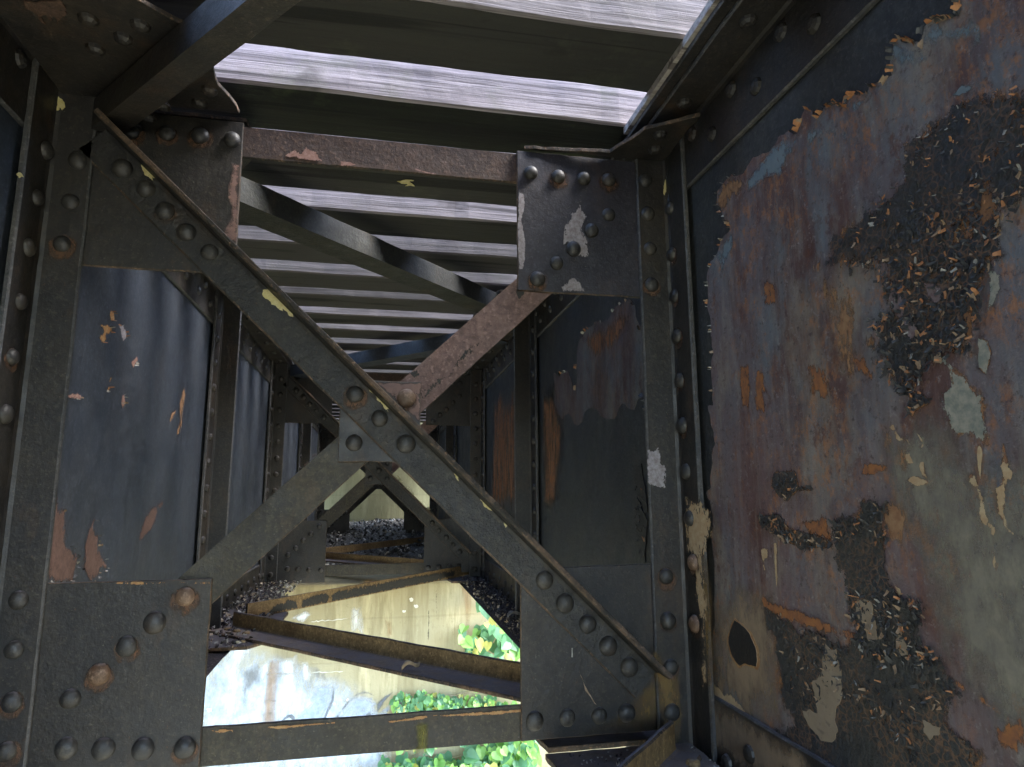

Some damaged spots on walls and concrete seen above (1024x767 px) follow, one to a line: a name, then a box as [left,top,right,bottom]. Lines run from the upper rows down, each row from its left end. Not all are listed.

peeling [563,205,589,257]
peeling [561,278,585,292]
corrosion [740,365,766,413]
peeling [703,0,1024,767]
corrosion [544,394,560,503]
peeling [49,498,109,582]
corrosion [883,502,907,551]
corrosion [762,597,855,650]
corrosion [714,704,804,767]
corrosion [997,717,1024,752]